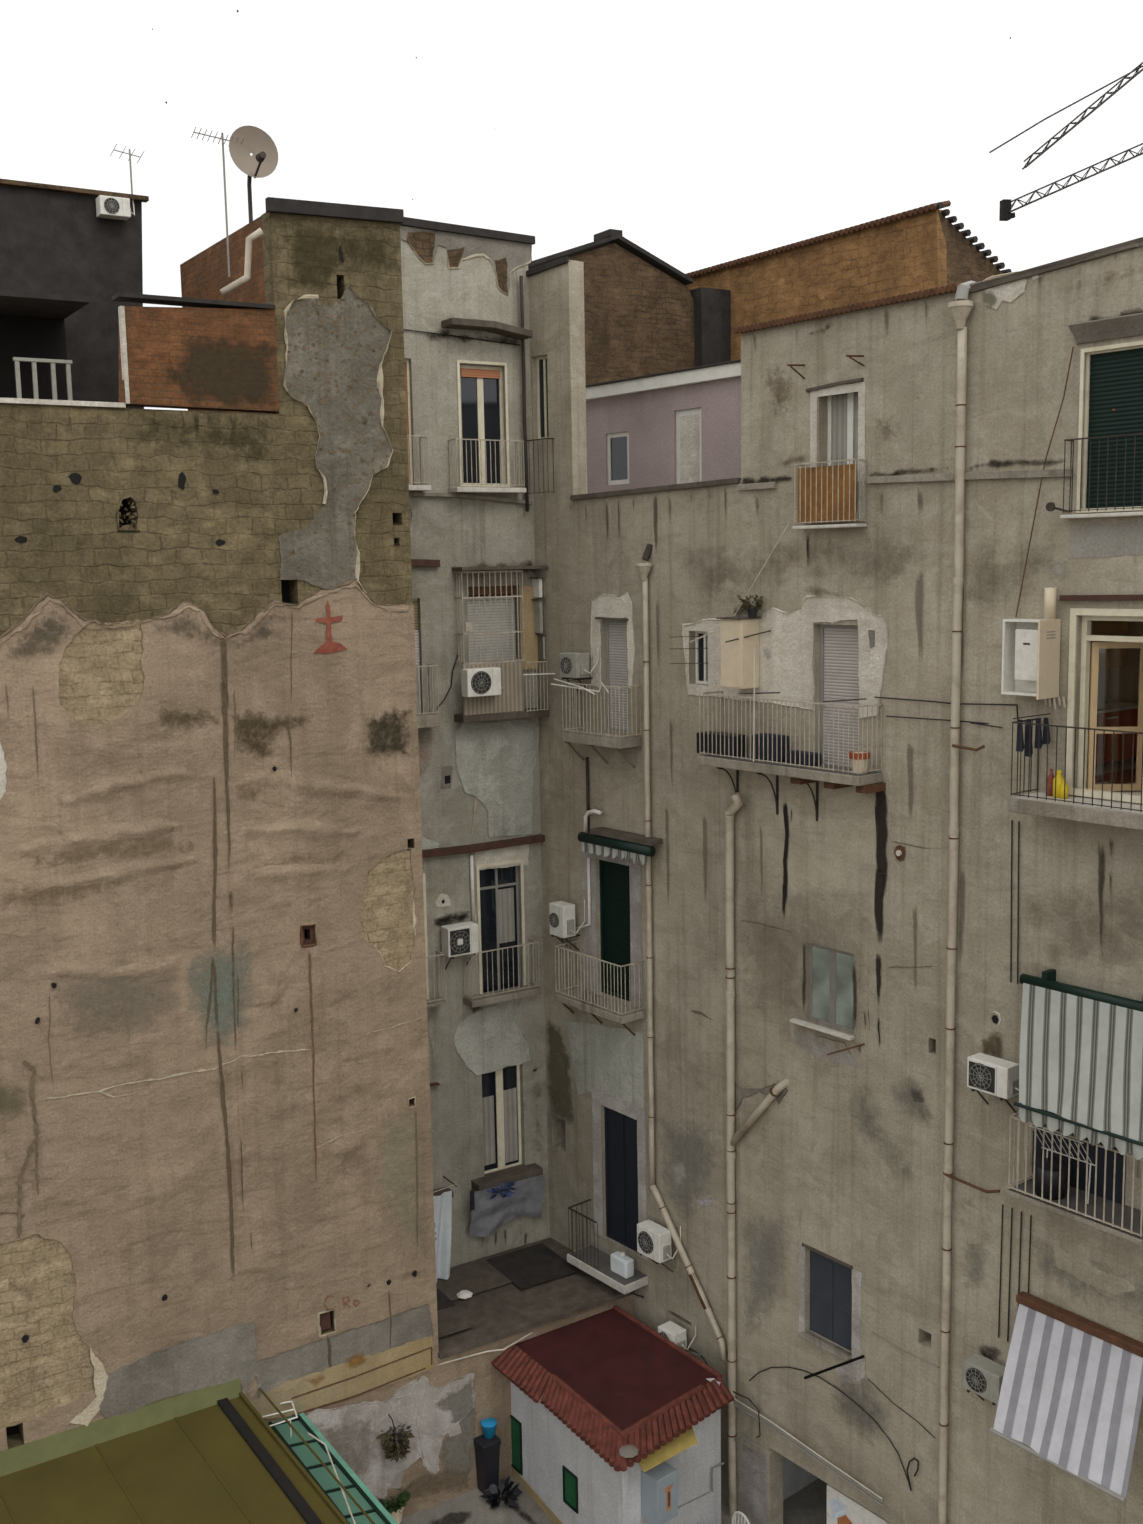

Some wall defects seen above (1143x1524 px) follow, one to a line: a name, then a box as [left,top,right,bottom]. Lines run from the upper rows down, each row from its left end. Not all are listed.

spalling [0,214,532,726]
damp [368,711,407,757]
spalling [682,595,888,719]
damp [165,616,305,1274]
peeling [421,836,440,850]
damp [852,791,887,1045]
spalling [0,1234,95,1430]
peeling [306,1373,476,1500]